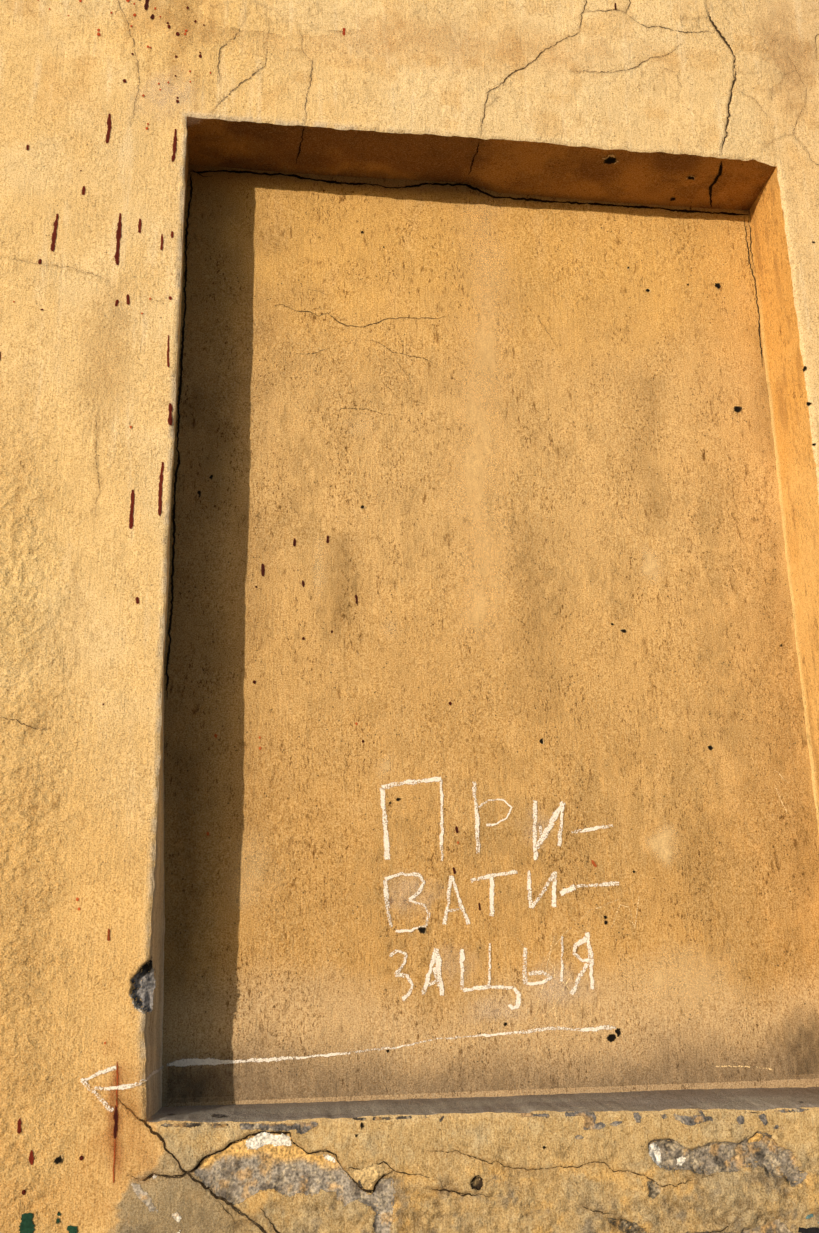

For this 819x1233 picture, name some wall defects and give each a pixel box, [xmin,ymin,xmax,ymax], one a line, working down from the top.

corrosion [126,0,205,36]
corrosion [38,214,58,264]
corrosion [114,213,122,265]
crack [166,0,819,696]
flaking render [129,956,155,1014]
flaking render [161,1114,396,1233]
crack [118,1098,716,1233]
flaking render [647,1101,809,1199]
peeling [131,1182,181,1233]